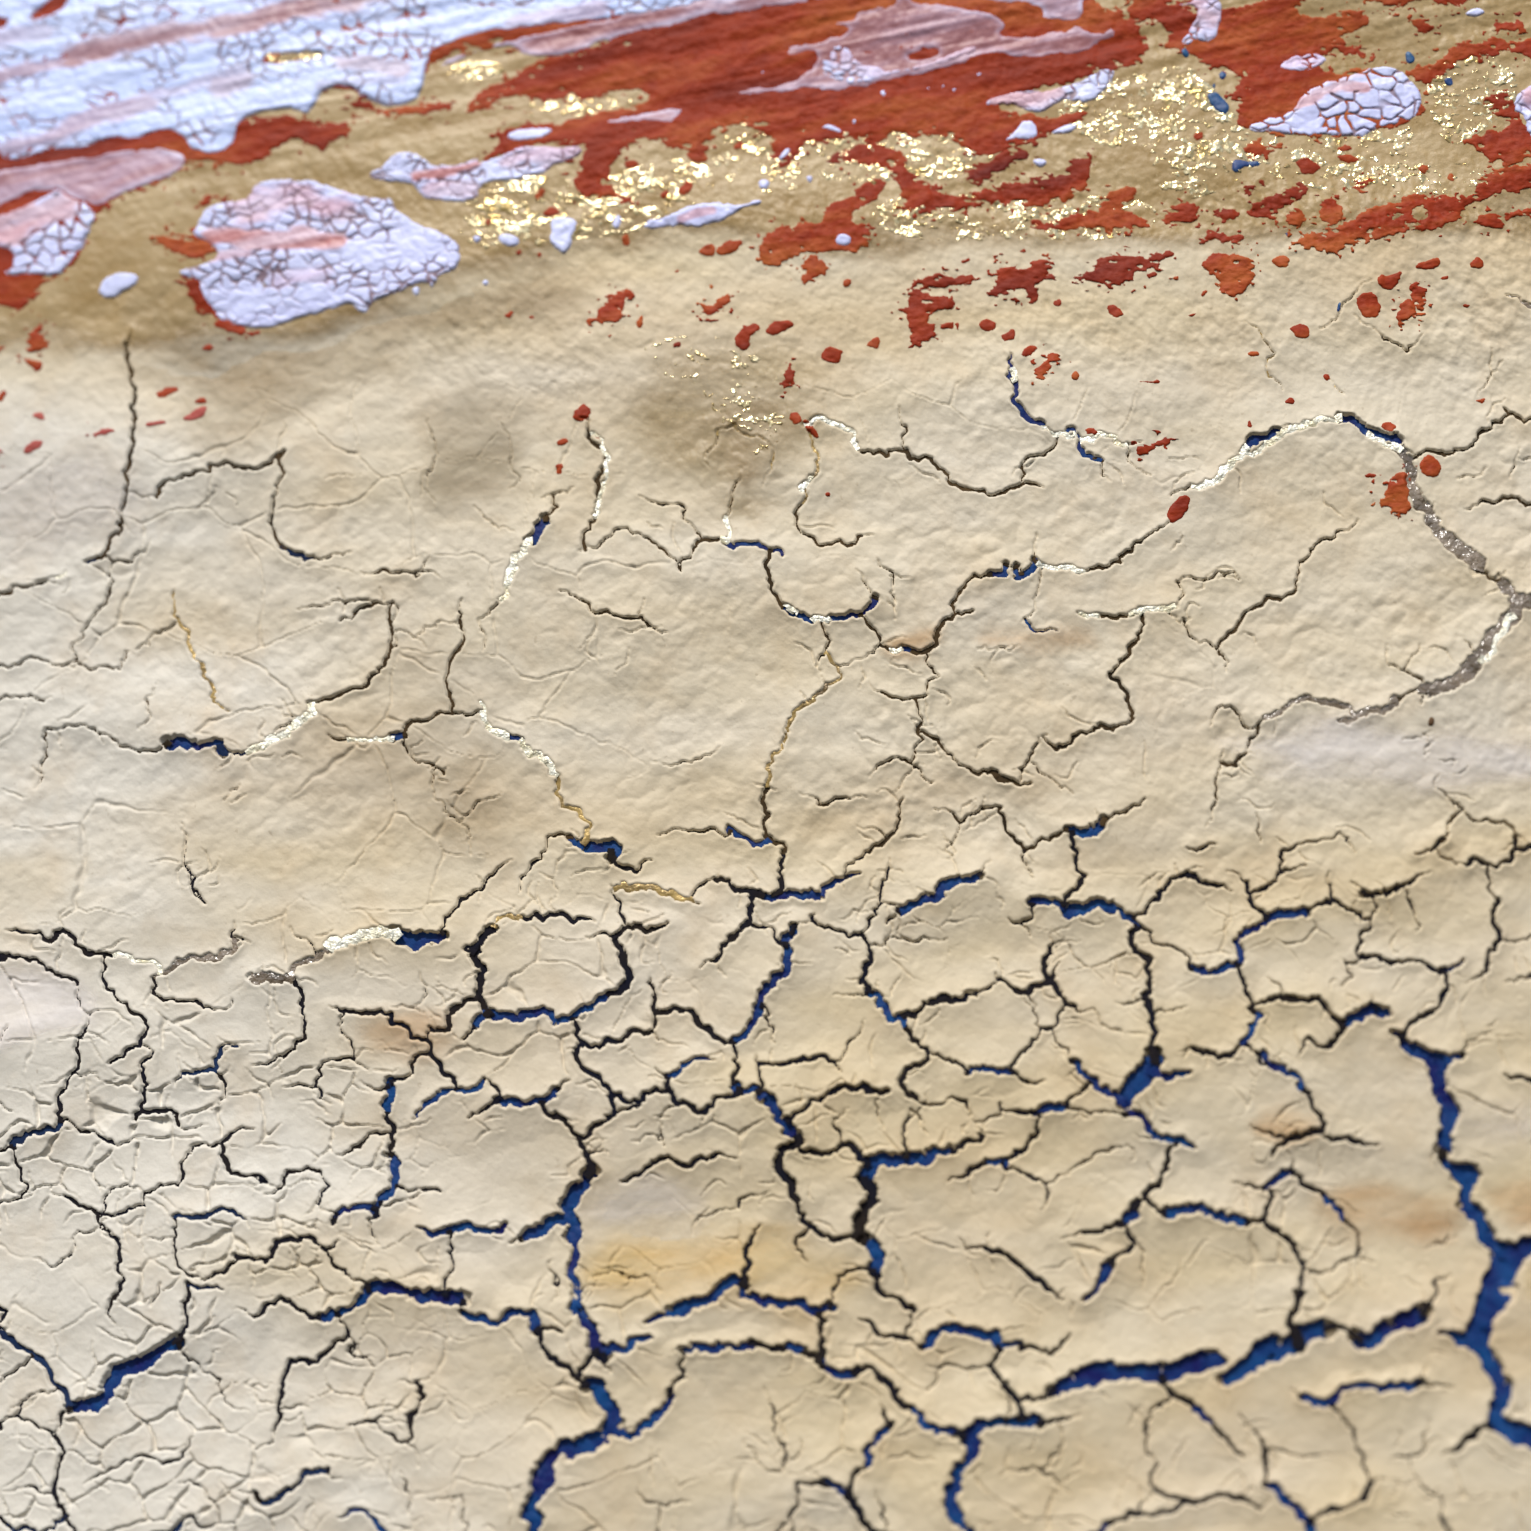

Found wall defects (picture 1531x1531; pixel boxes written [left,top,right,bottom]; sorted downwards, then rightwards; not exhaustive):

peeling [1180,0,1222,45]
peeling [823,46,976,84]
peeling [986,69,1114,112]
peeling [1250,54,1421,137]
peeling [1514,85,1531,135]
peeling [508,128,552,141]
peeling [644,200,761,229]
peeling [180,179,460,328]
crack [1506,295,1531,309]
crack [0,326,1531,1531]